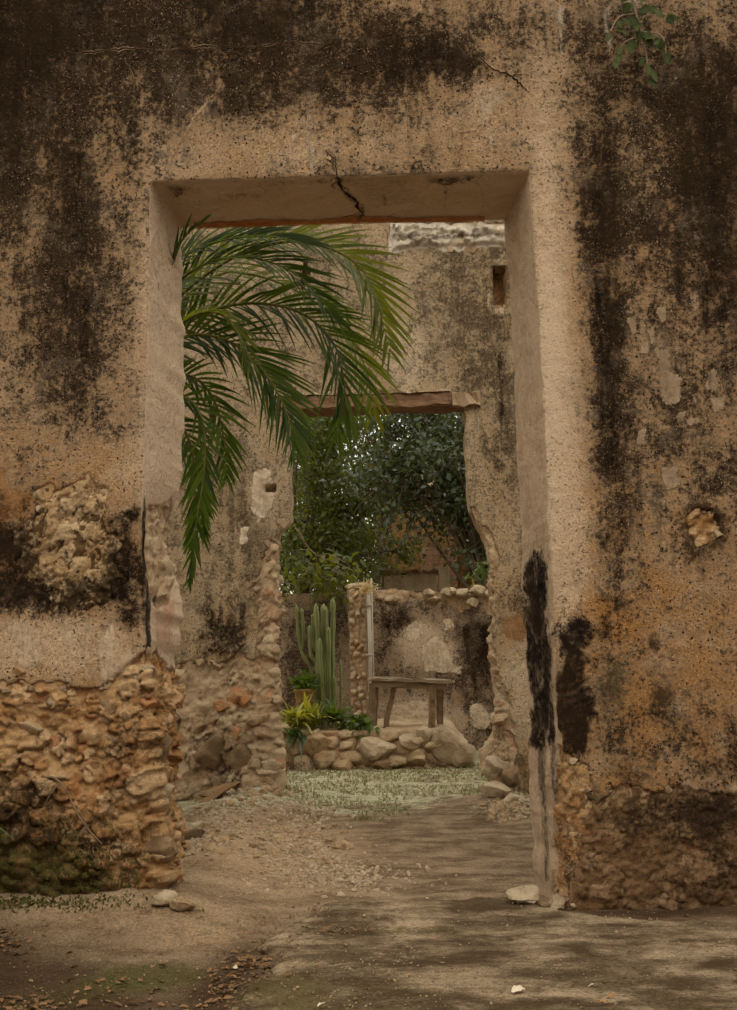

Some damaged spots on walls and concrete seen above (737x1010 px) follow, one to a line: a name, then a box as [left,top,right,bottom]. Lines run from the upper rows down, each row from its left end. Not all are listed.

crack [47,41,338,93]
crack [479,57,529,93]
crack [314,150,365,220]
water stain [670,52,737,342]
water stain [580,125,621,480]
water stain [679,501,729,563]
spalling [686,508,737,547]
water stain [0,553,70,620]
water stain [102,499,175,648]
spalling [0,474,289,895]
water stain [650,684,675,715]
spalling [552,747,737,911]